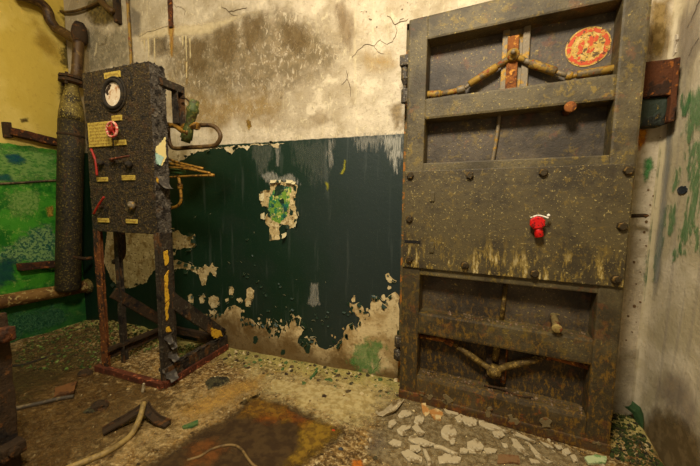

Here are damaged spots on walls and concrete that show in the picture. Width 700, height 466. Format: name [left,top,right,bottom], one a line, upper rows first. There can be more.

leakage [86,0,334,124]
leakage [336,4,353,41]
crack [346,16,408,97]
leakage [381,105,403,174]
peeling [104,61,400,380]
leakage [147,399,343,466]